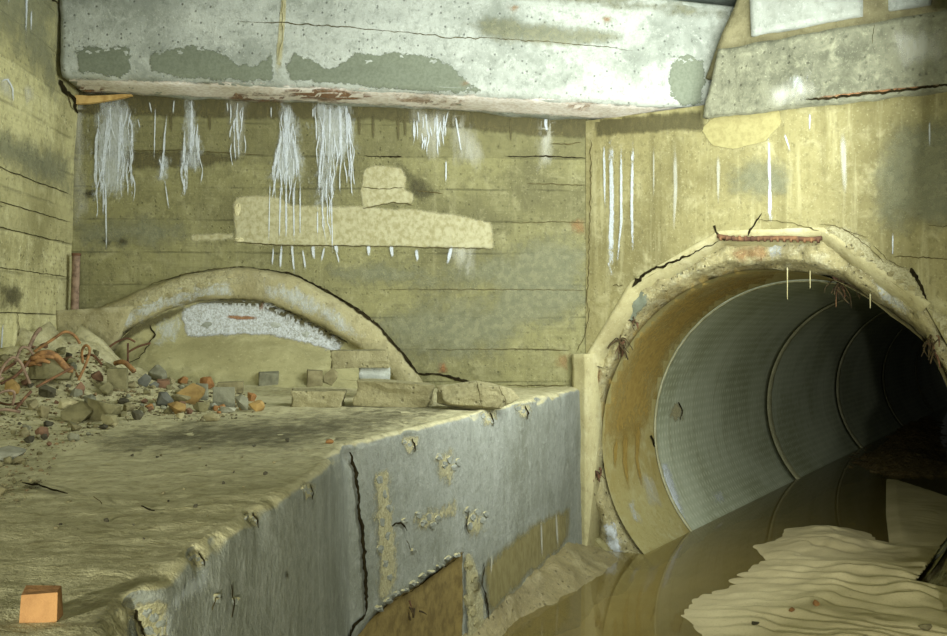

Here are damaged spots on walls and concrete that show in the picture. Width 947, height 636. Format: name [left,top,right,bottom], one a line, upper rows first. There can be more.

peeling [74,45,131,79]
peeling [150,45,274,83]
peeling [287,52,481,94]
peeling [669,55,706,106]
crack [806,84,947,100]
damp [69,79,704,280]
damp [735,144,787,215]
damp [880,123,947,223]
crack [151,138,592,408]
crack [613,225,725,287]
crack [748,213,947,300]
crack [349,452,369,636]